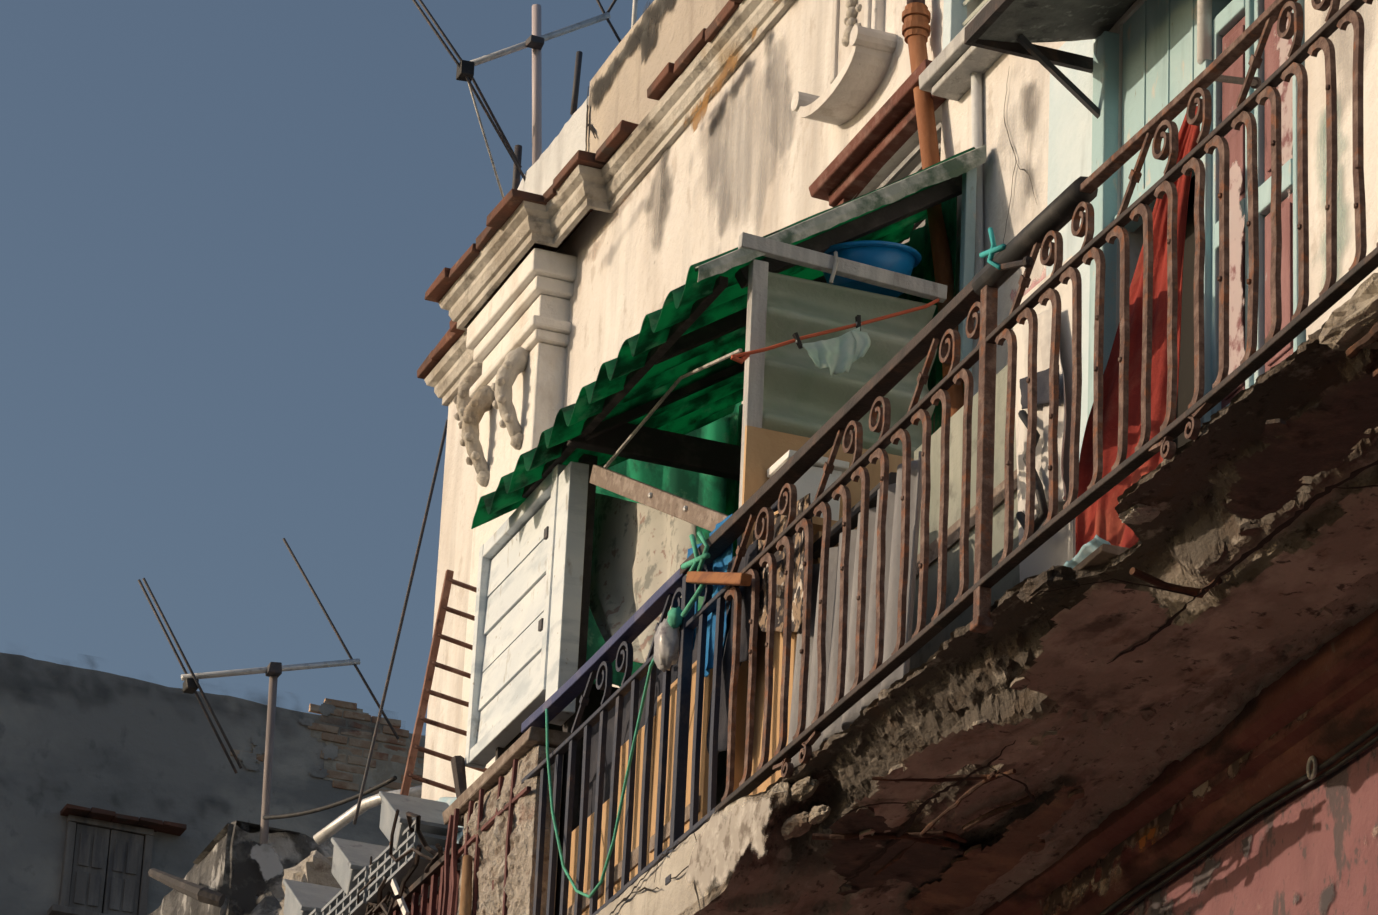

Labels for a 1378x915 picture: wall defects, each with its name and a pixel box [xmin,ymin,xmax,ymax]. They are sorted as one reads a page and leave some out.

damp [591,0,674,108]
damp [647,148,671,245]
peeling [1263,418,1289,436]
crack [1038,460,1378,664]
flaking render [299,698,424,798]
flaking render [686,484,1378,915]
crack [836,740,1037,894]